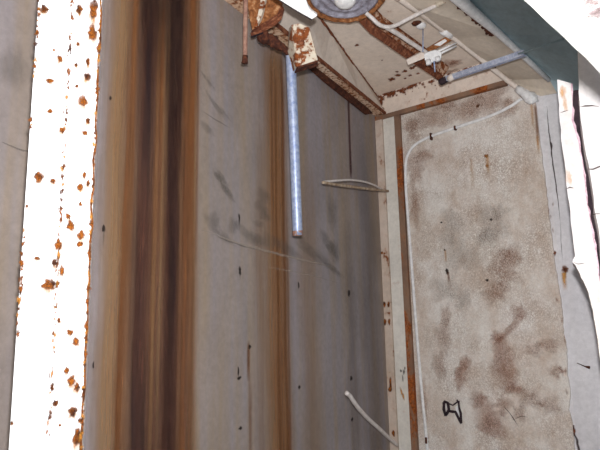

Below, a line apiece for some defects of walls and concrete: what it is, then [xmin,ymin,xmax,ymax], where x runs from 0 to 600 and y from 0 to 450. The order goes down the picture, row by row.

rust [16,228,26,337]
rust [33,0,102,450]
rust [99,0,197,450]
rust [377,65,436,109]